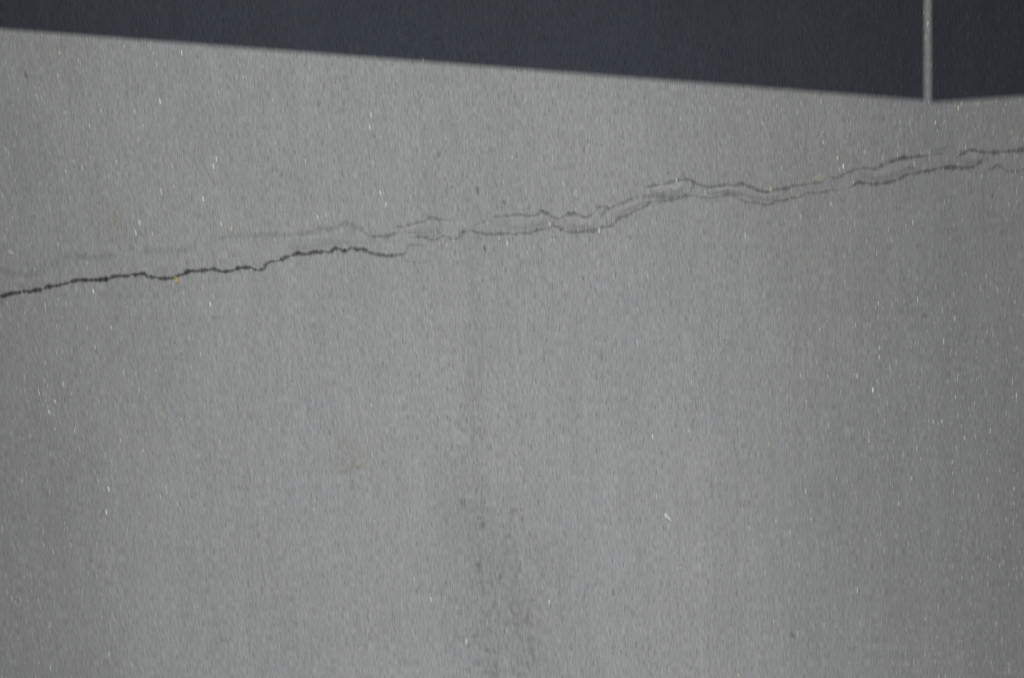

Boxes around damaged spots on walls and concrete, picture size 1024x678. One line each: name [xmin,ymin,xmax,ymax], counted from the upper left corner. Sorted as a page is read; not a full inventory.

crack [870,161,912,178]
crack [655,184,682,192]
crack [1,247,366,297]